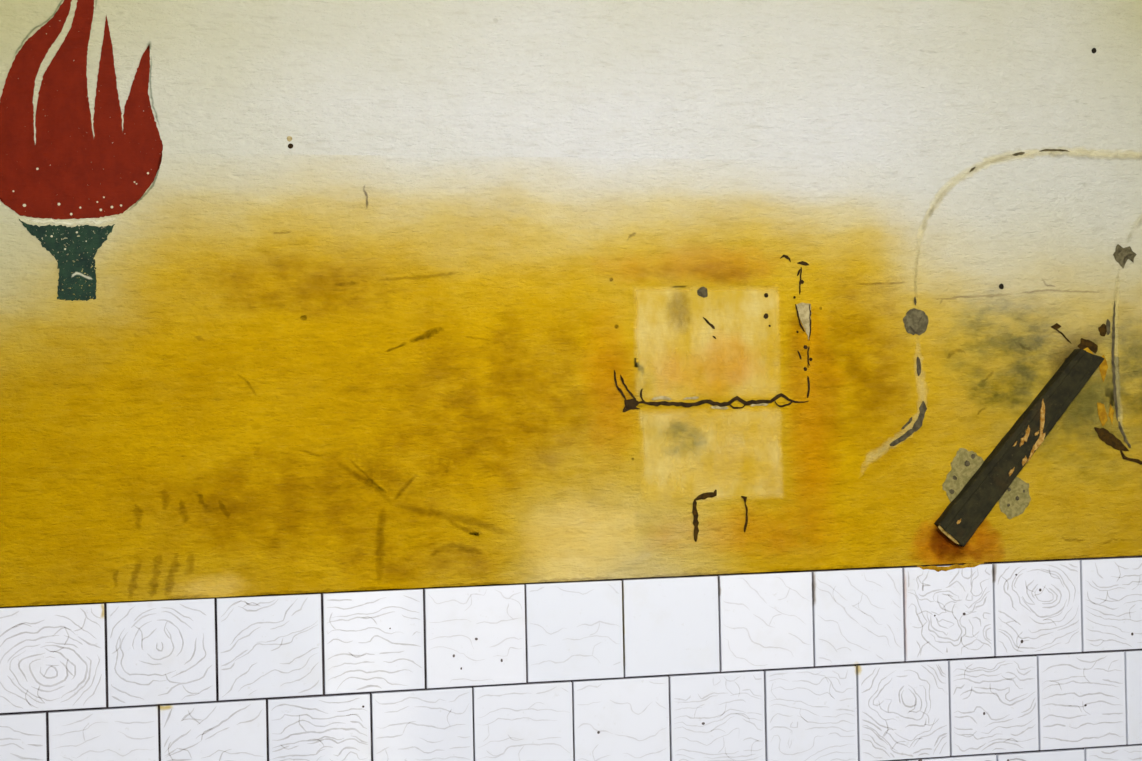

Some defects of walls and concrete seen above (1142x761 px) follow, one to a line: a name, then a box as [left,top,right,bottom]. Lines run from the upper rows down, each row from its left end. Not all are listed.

crack [614,261,813,412]